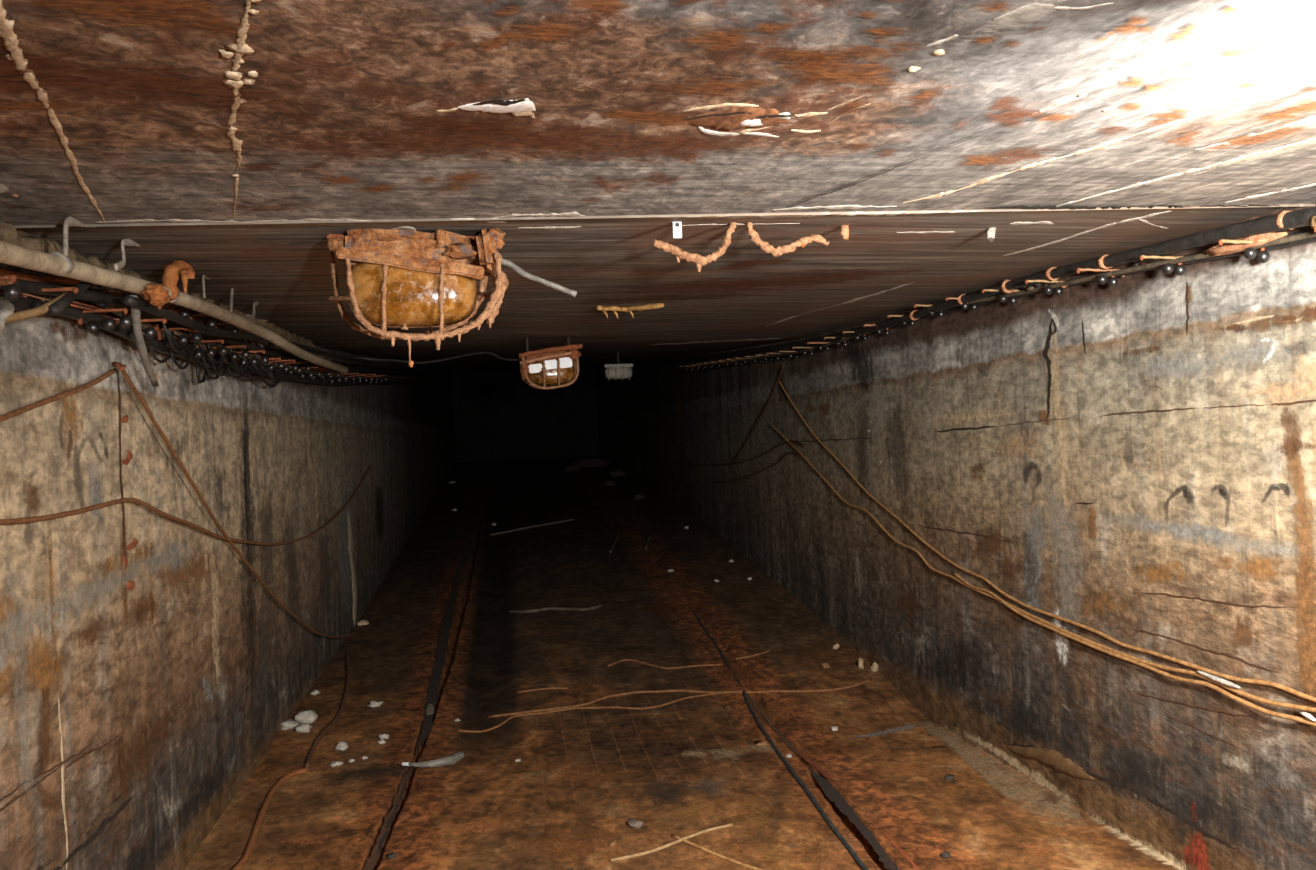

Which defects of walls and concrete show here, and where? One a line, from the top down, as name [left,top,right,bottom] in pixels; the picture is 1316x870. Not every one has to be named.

rust [0,46,306,111]
spalling [437,98,538,139]
spalling [683,95,873,137]
rust [1120,103,1196,146]
rust [1211,88,1316,149]
crack [1184,283,1192,333]
crack [934,309,1316,511]
leakage [241,415,260,709]
crack [1134,592,1287,608]
rust [1281,408,1316,734]
leakage [0,547,154,870]
leakage [1106,794,1240,870]